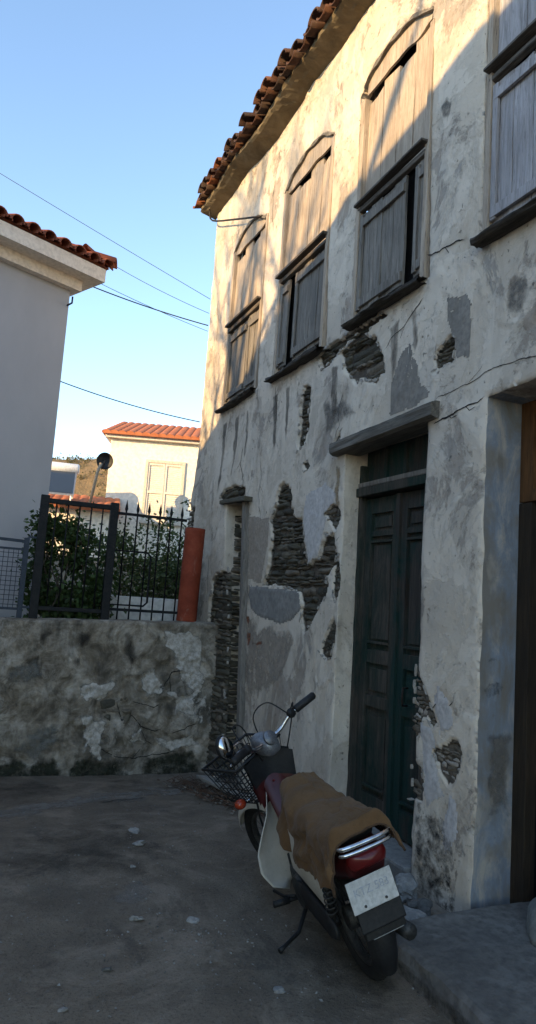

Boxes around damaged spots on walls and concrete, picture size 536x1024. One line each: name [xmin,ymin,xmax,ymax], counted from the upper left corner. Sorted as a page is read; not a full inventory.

flaking render [296,389,311,473]
flaking render [315,294,472,416]
crack [434,356,536,424]
flaking render [141,485,341,779]
water stain [0,759,186,818]
flaking render [80,681,145,760]
crack [101,670,197,759]
water stain [144,752,197,774]
peeling [407,664,463,855]
mould [414,816,452,910]